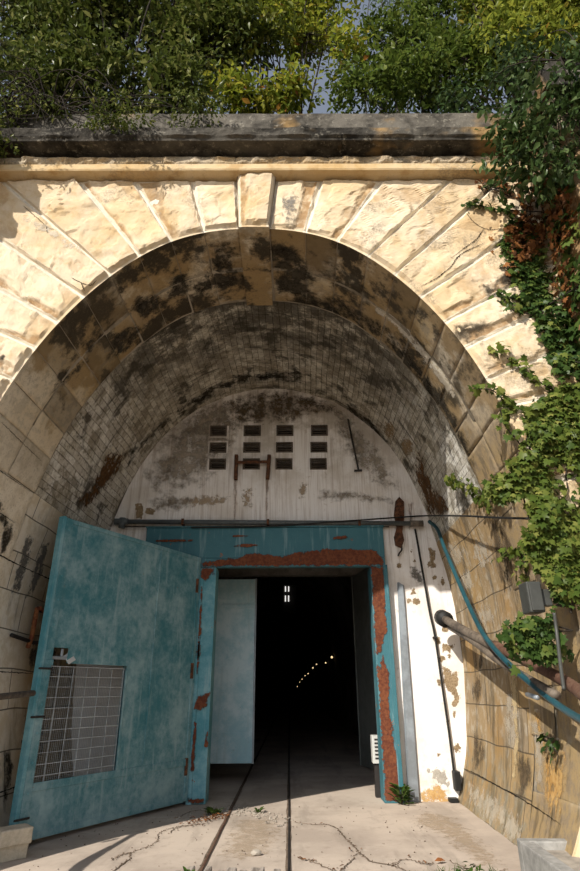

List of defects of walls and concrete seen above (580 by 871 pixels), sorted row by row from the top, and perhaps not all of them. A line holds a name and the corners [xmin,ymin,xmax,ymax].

damp [133,242,242,318]
crack [426,213,503,284]
damp [270,244,473,466]
damp [128,369,393,509]
corrosion [415,453,449,517]
damp [0,503,13,553]
damp [11,536,49,595]
corrosion [194,535,399,802]
peeling [436,627,461,724]
corrosion [191,722,208,772]
crack [112,808,216,871]
crack [296,822,465,871]